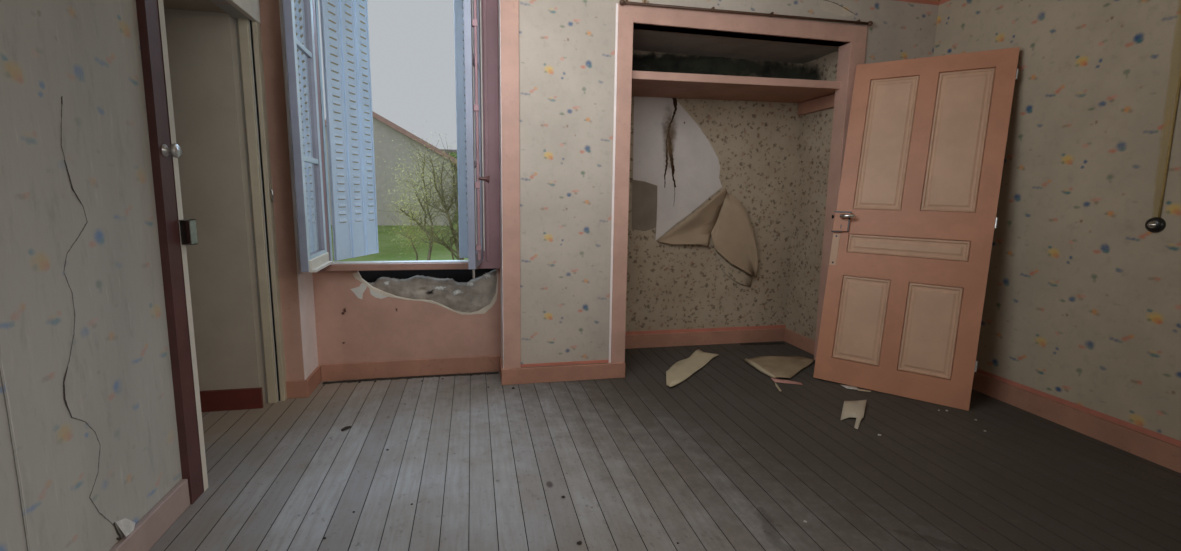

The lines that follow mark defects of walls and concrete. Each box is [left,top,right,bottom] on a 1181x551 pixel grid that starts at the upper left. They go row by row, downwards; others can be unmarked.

peeling [632,96,722,241]
crack [61,96,118,531]
spalling [351,269,498,315]